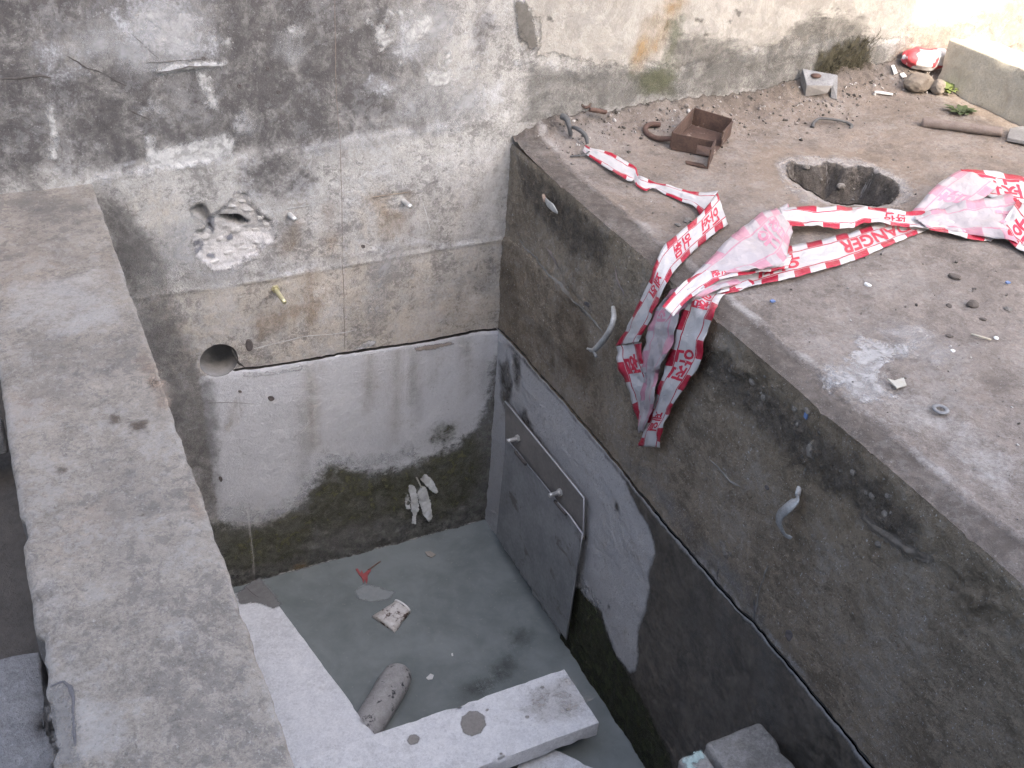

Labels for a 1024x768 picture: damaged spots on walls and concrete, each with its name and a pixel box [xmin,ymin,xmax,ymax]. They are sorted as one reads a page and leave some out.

peeling [92,3,230,66]
water stain [197,72,217,107]
water stain [528,14,861,118]
peeling [514,0,1024,70]
water stain [48,105,58,159]
water stain [146,118,252,170]
spalling [190,191,277,271]
water stain [212,349,539,587]
water stain [575,470,866,768]